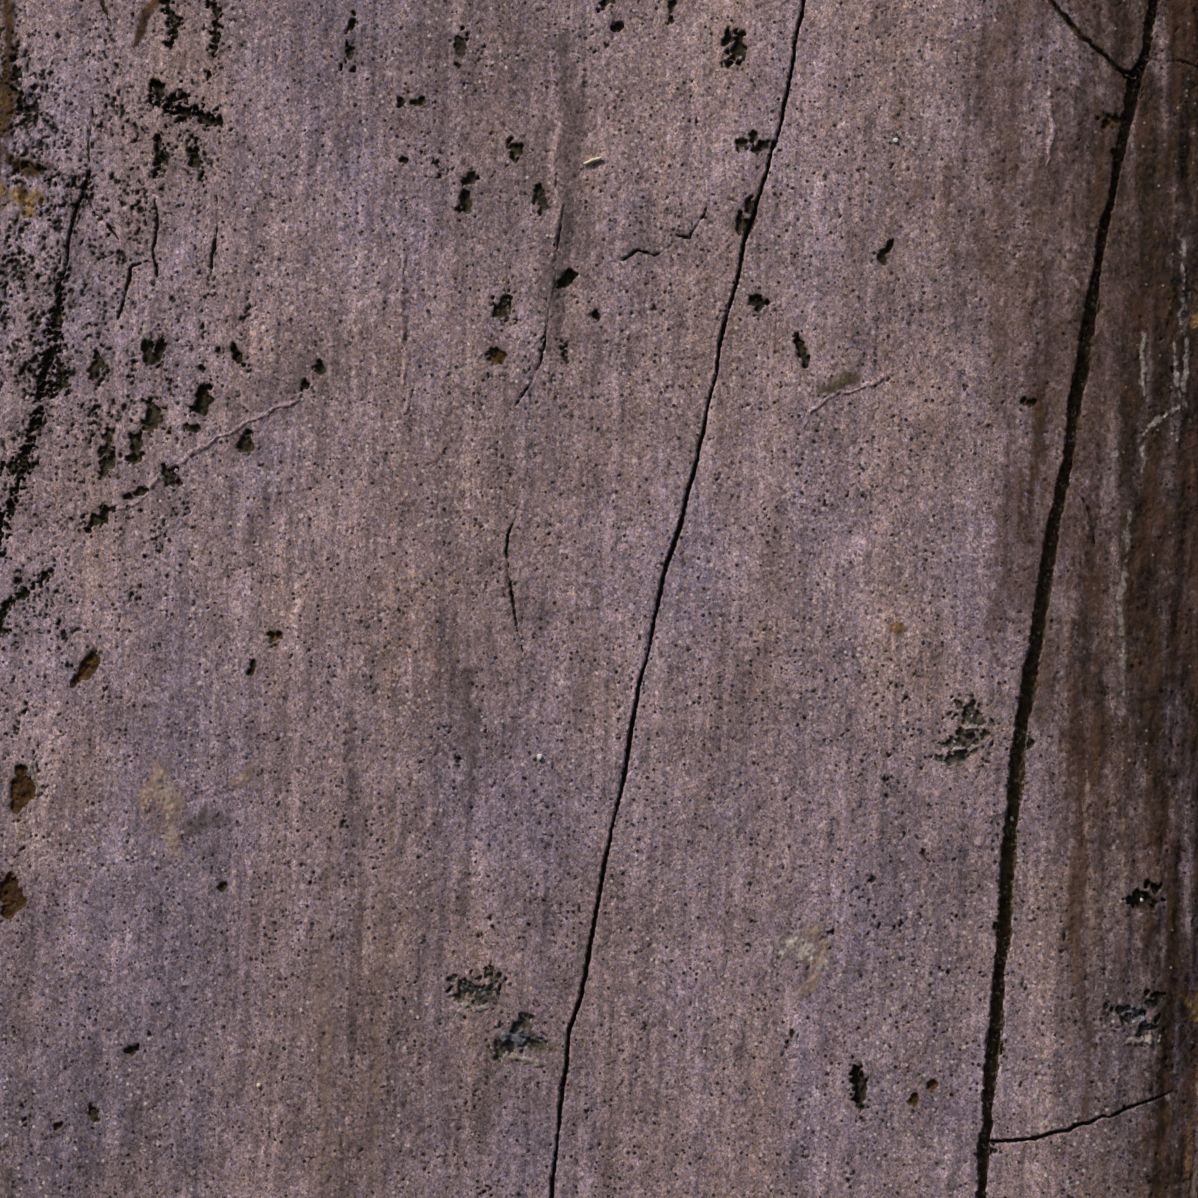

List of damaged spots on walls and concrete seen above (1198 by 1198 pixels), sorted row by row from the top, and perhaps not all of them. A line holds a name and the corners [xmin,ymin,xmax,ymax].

spalling [160,0,186,50]
spalling [204,0,224,81]
spalling [145,79,224,188]
spalling [455,169,480,222]
spalling [491,281,519,318]
spalling [141,325,167,366]
spalling [214,343,246,367]
spalling [97,364,214,480]
spalling [81,463,183,534]
crack [550,0,806,1198]
crack [976,0,1198,1198]
damp [1054,0,1198,1198]